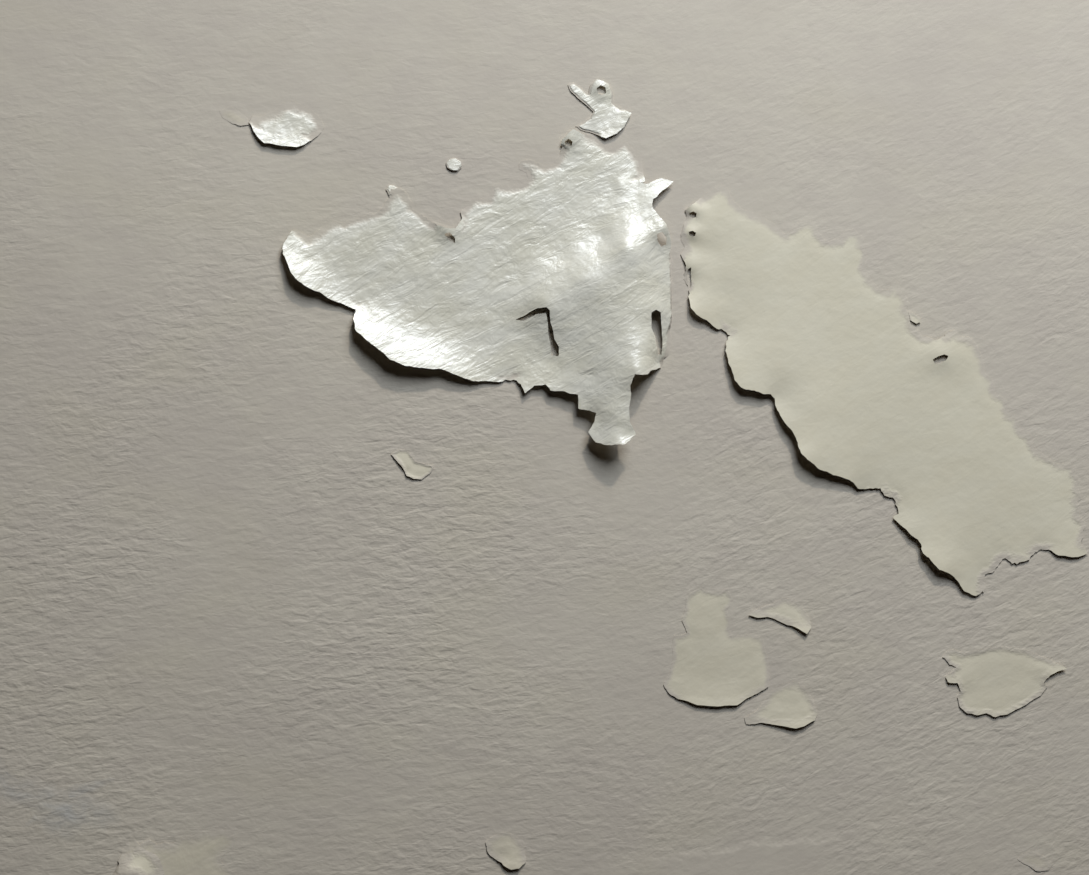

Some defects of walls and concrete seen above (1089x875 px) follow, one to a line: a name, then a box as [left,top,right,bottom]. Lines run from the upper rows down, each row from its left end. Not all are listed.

peeling [249,101,324,147]
peeling [282,80,1087,596]
peeling [663,588,818,728]
peeling [943,647,1067,717]
peeling [485,832,526,870]